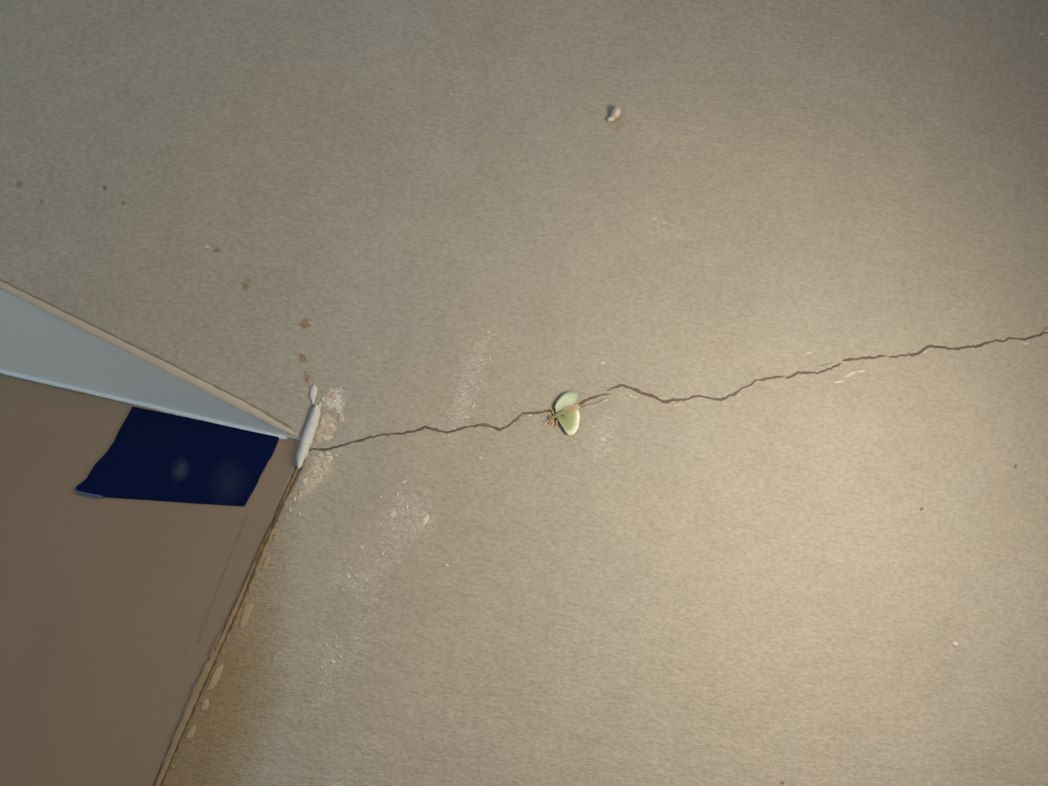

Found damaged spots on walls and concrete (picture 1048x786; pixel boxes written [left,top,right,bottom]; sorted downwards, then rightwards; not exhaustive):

crack [153,327,1048,786]